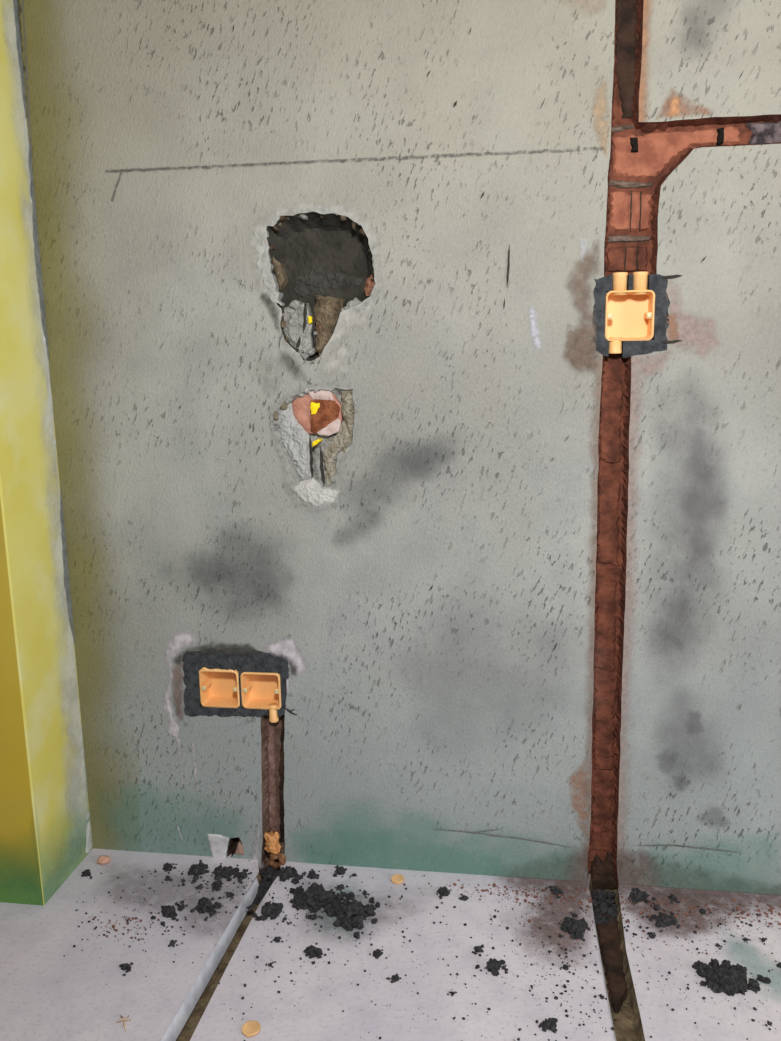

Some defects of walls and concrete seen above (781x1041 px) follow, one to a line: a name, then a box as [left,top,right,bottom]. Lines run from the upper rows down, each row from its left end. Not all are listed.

rust [639,0,649,122]
rust [663,94,708,116]
spalling [253,207,378,364]
spalling [271,387,358,508]
rust [566,256,603,518]
rust [617,359,638,868]